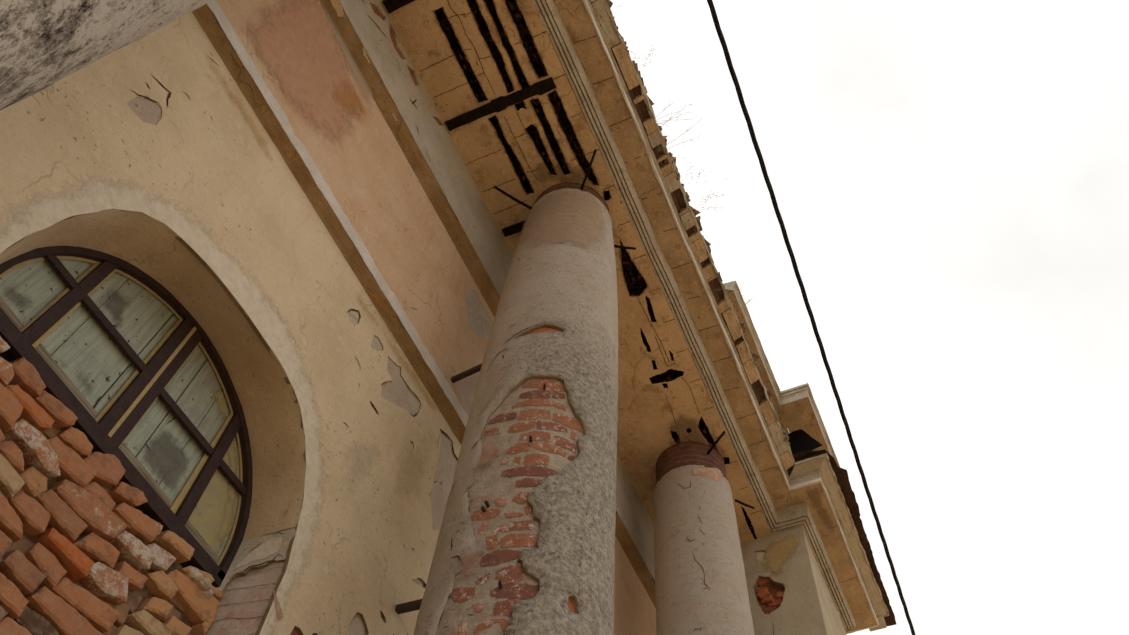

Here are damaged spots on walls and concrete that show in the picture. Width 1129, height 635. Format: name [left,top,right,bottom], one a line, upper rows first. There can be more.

flaking render [128,98,161,125]
leakage [250,0,365,142]
flaking render [370,4,417,108]
flaking render [371,336,420,416]
flaking render [436,373,584,635]
flaking render [203,554,294,635]
spalling [755,578,785,614]